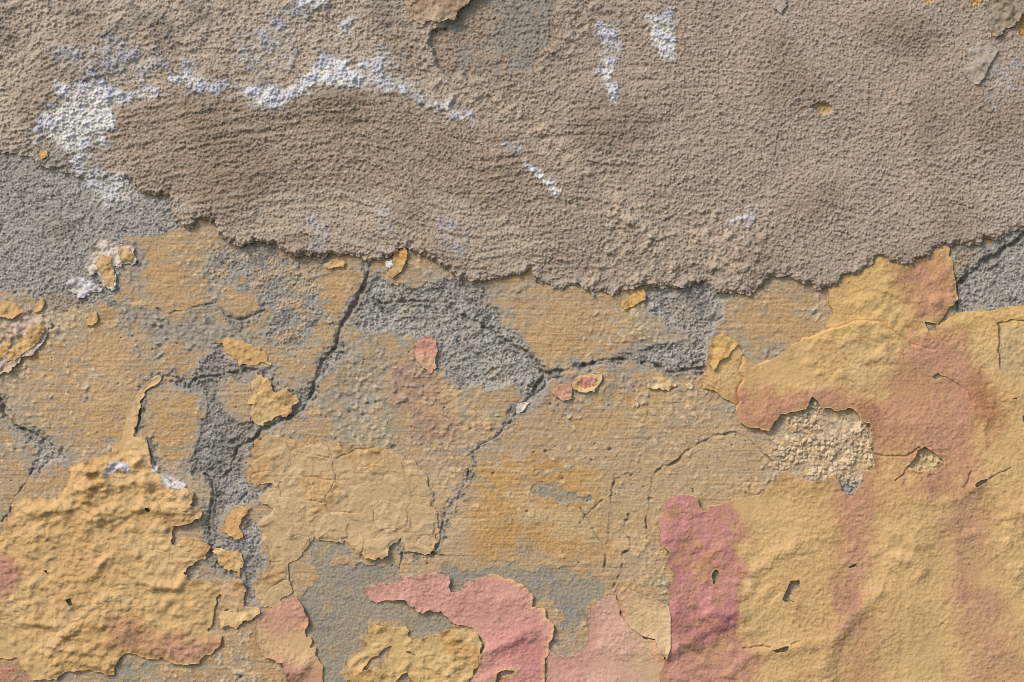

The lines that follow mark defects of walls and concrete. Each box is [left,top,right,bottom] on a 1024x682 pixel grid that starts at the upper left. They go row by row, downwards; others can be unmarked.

efflorescence [29,16,474,211]
efflorescence [239,0,328,67]
efflorescence [595,20,622,104]
efflorescence [644,7,677,62]
peeling [0,149,185,375]
crack [156,302,266,322]
crack [135,369,251,471]
crack [204,263,704,578]
peeling [0,226,1024,682]
crack [579,431,775,593]